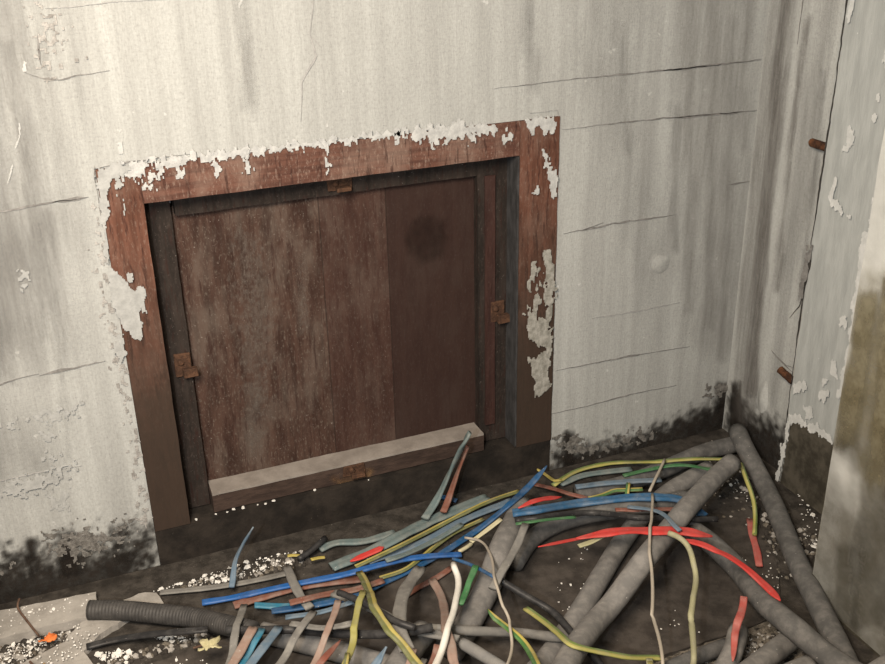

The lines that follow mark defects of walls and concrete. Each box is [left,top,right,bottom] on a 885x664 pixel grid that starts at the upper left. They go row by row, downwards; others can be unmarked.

peeling [846,0,855,23]
peeling [525,115,557,136]
peeling [532,149,558,199]
peeling [828,176,851,219]
peeling [0,118,513,568]
peeling [522,249,558,398]
peeling [775,191,875,482]
crack [0,361,104,386]
water stain [0,524,158,604]